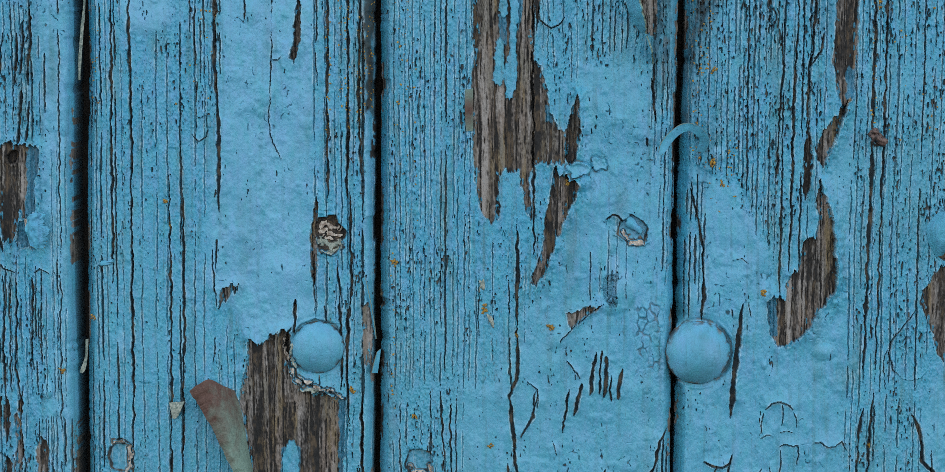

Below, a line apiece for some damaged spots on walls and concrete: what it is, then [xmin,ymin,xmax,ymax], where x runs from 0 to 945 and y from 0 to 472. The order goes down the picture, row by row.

peeling [832,0,859,111]
peeling [0,141,50,249]
peeling [465,0,607,285]
crack [691,191,706,318]
crack [775,0,825,262]
peeling [767,180,836,348]
crack [862,0,922,380]
peeling [920,212,945,361]
peeling [169,329,346,472]
crack [729,305,743,415]
crack [856,401,873,472]
crack [912,416,934,472]